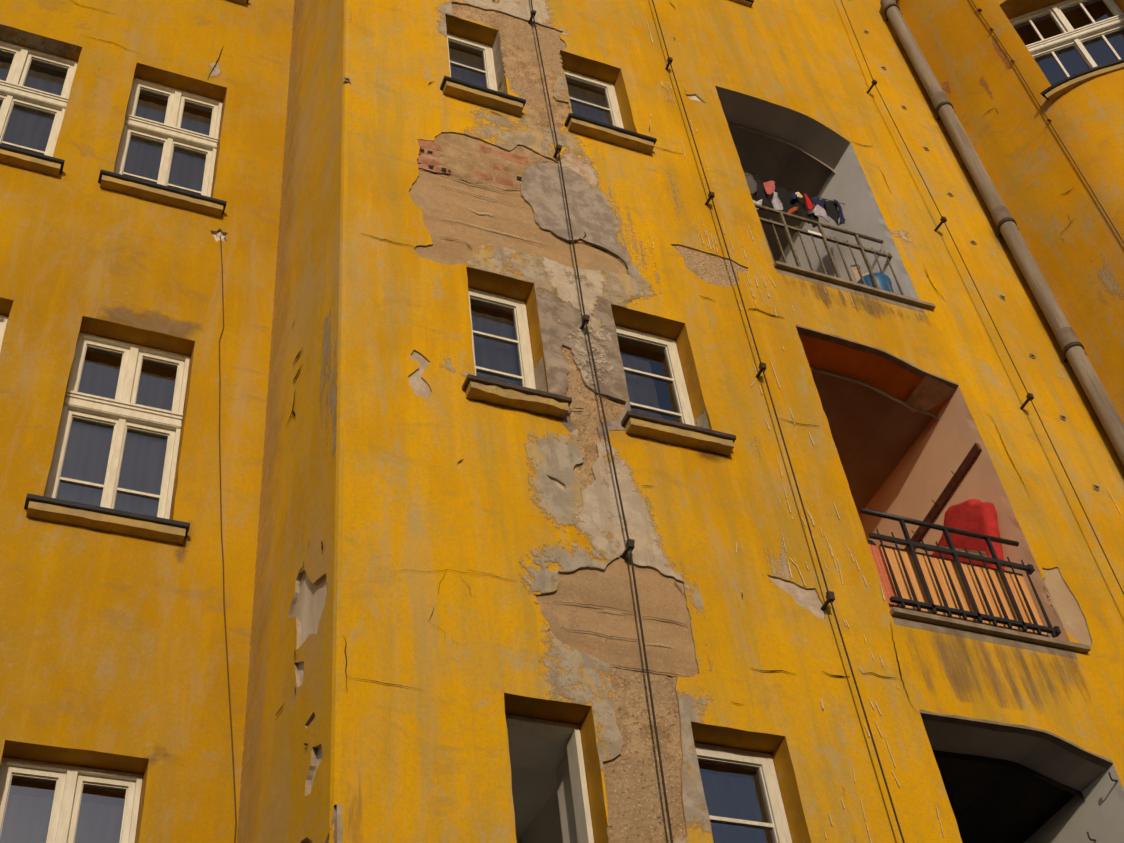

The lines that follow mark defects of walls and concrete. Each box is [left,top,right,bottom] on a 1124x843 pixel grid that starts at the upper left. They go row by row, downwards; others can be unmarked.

flaking render [671,244,748,287]
flaking render [408,0,712,843]
flaking render [287,570,327,687]
crack [391,569,516,645]
flaking render [763,543,827,619]
flaking render [1042,567,1093,648]
water stain [938,638,1021,705]